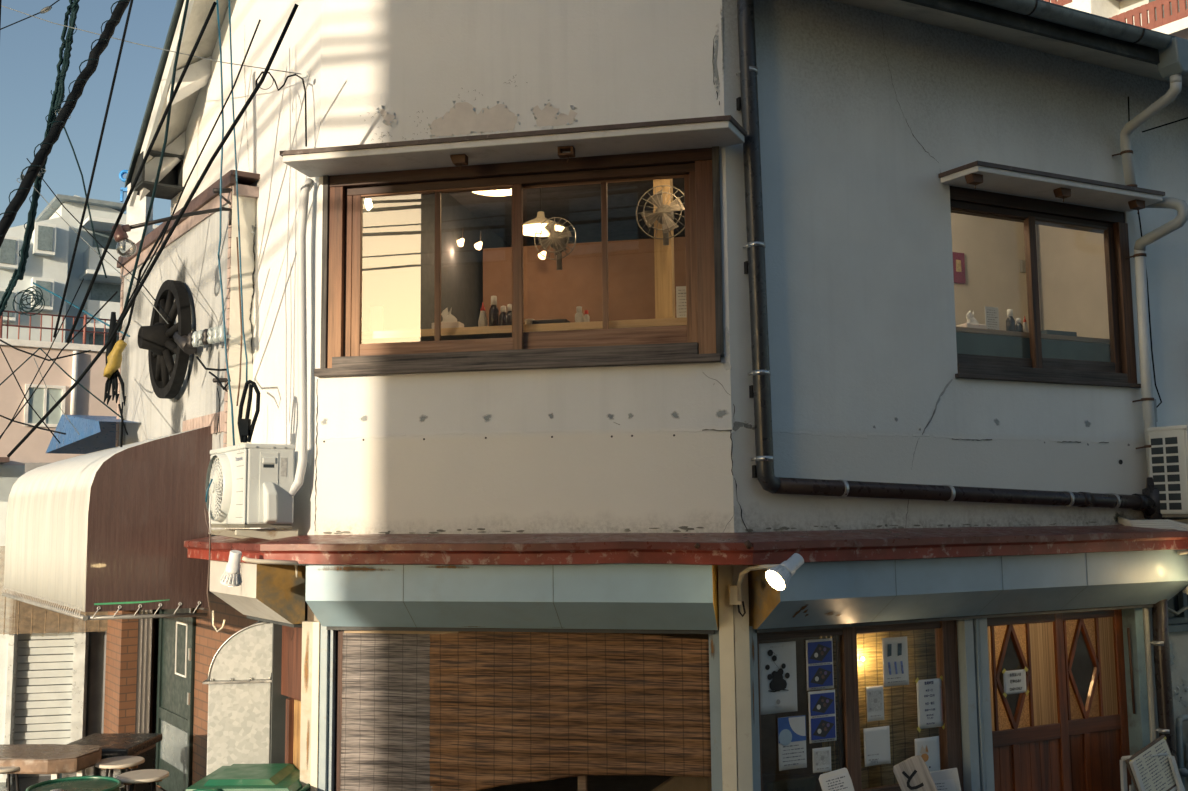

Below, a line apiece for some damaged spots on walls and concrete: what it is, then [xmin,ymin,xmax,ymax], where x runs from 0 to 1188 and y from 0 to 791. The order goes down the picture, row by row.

peeling [360,105,397,140]
peeling [411,88,577,140]
crack [707,376,747,532]
crack [911,379,952,470]